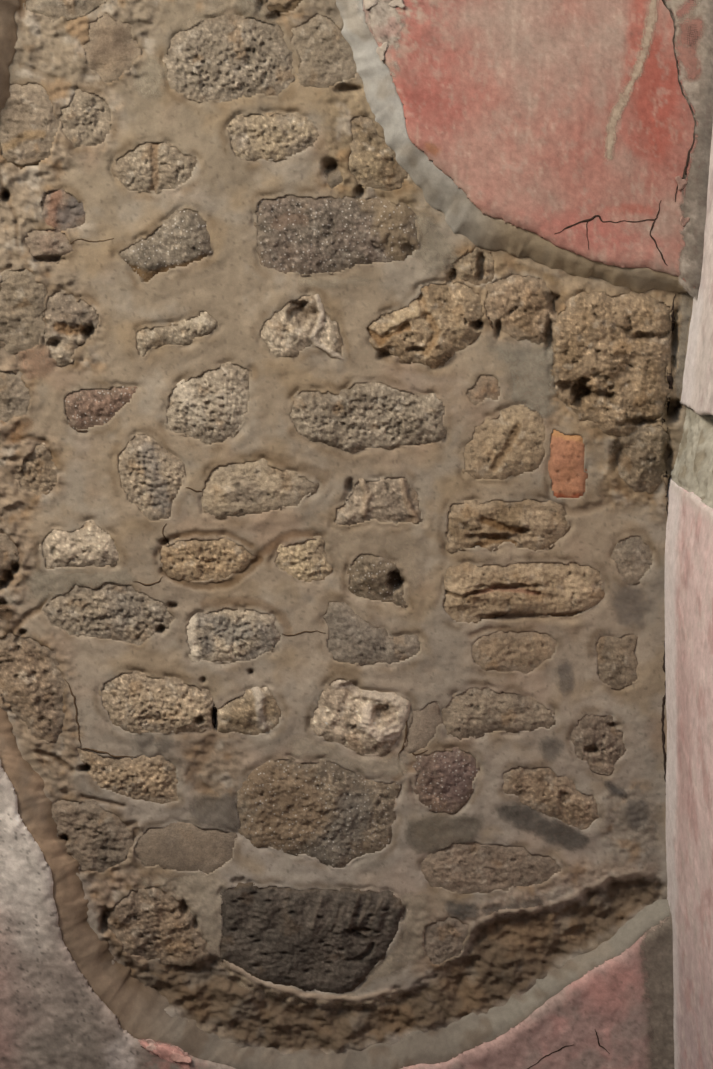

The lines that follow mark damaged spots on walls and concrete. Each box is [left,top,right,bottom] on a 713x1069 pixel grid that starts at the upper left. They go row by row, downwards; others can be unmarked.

spalling [0,0,20,118]
spalling [336,0,689,293]
crack [555,0,696,266]
peeling [666,0,713,300]
spalling [671,406,713,508]
spalling [0,707,675,1069]